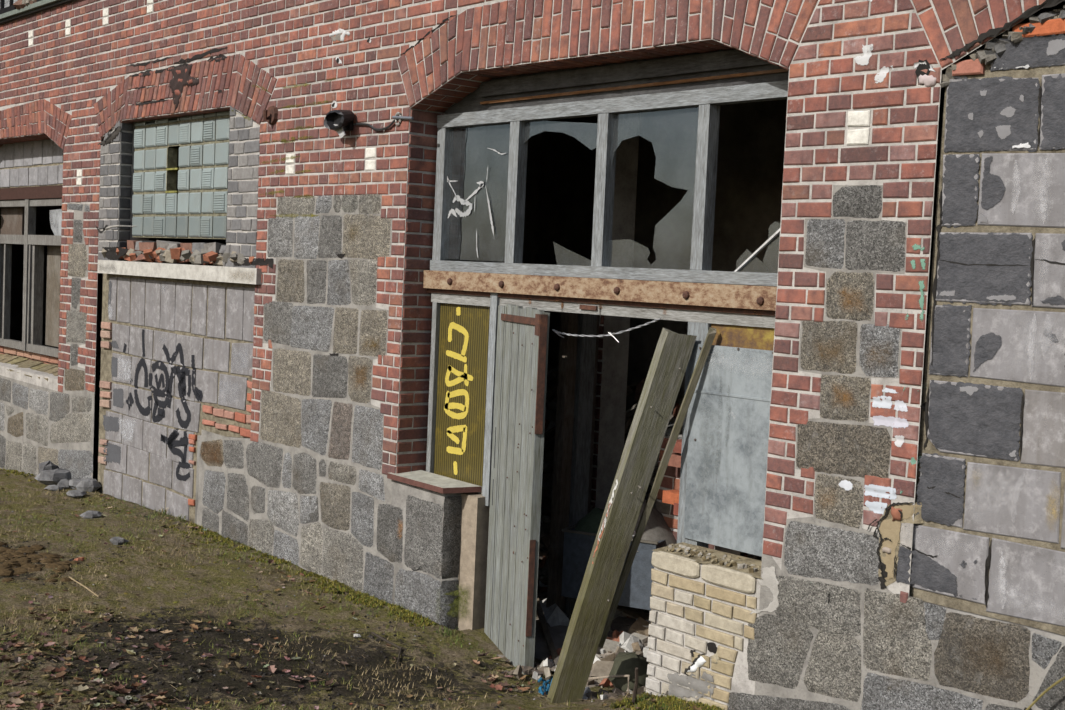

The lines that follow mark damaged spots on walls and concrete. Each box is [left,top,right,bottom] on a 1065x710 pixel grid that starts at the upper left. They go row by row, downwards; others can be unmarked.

spalling [169,64,199,110]
spalling [102,240,273,269]
spalling [878,33,1065,599]